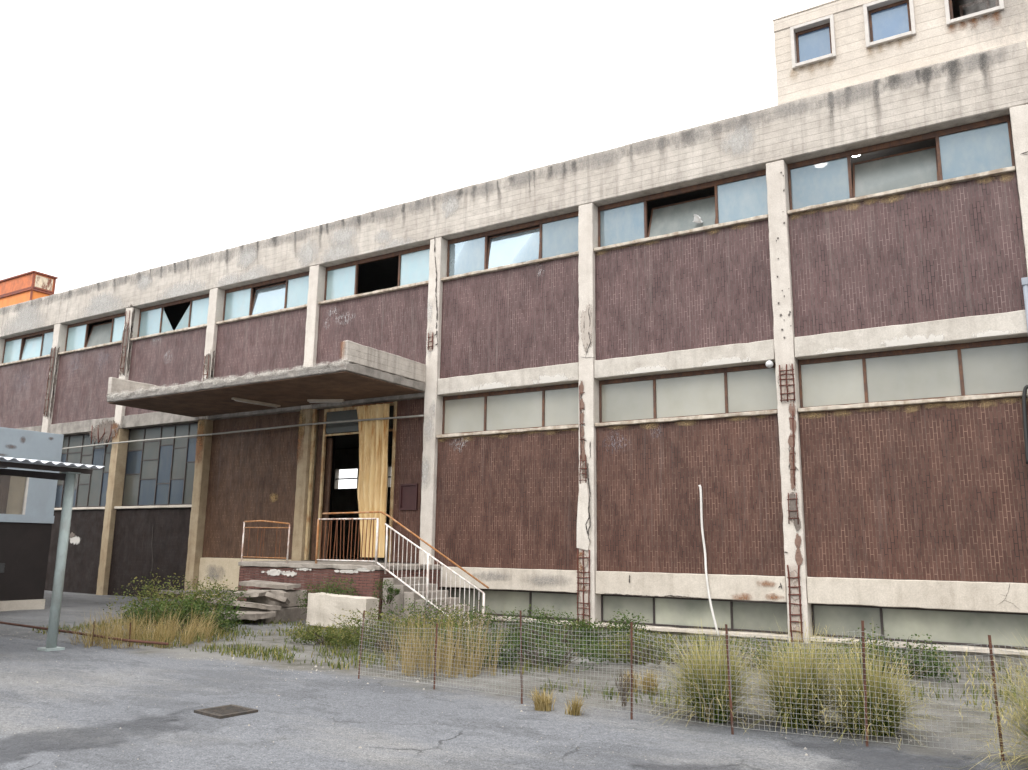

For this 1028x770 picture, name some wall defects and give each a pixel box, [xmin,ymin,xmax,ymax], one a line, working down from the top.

water stain [829,67,931,109]
water stain [947,54,1000,80]